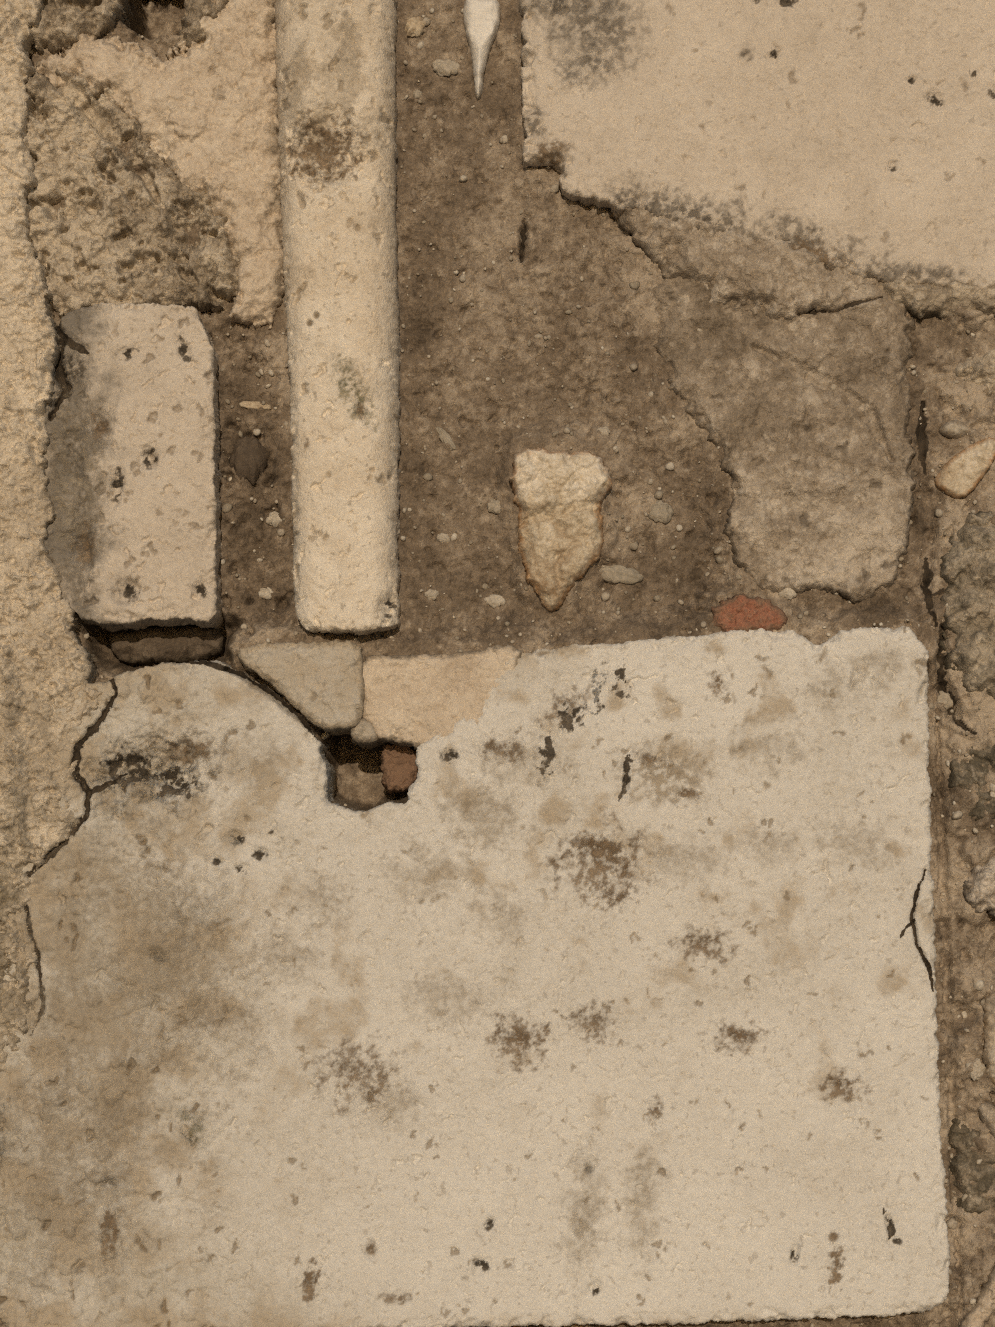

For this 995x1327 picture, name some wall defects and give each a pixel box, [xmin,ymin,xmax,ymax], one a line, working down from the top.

crack [915,401,929,475]
crack [920,557,977,735]
crack [23,678,128,1035]
crack [900,869,934,992]